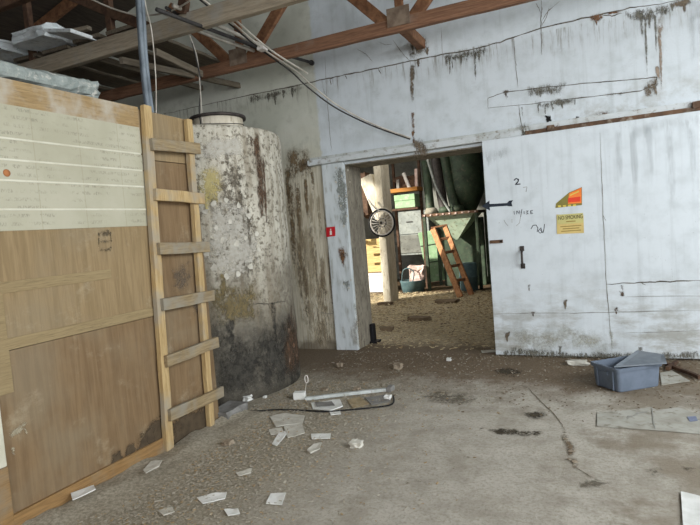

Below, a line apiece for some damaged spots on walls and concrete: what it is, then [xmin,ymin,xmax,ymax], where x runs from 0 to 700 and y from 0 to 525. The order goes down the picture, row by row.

leakage [445,48,485,76]
leakage [627,5,673,63]
leakage [250,88,301,104]
leakage [529,84,571,114]
rust [250,134,267,221]
leakage [285,151,314,264]
leakage [213,274,299,393]